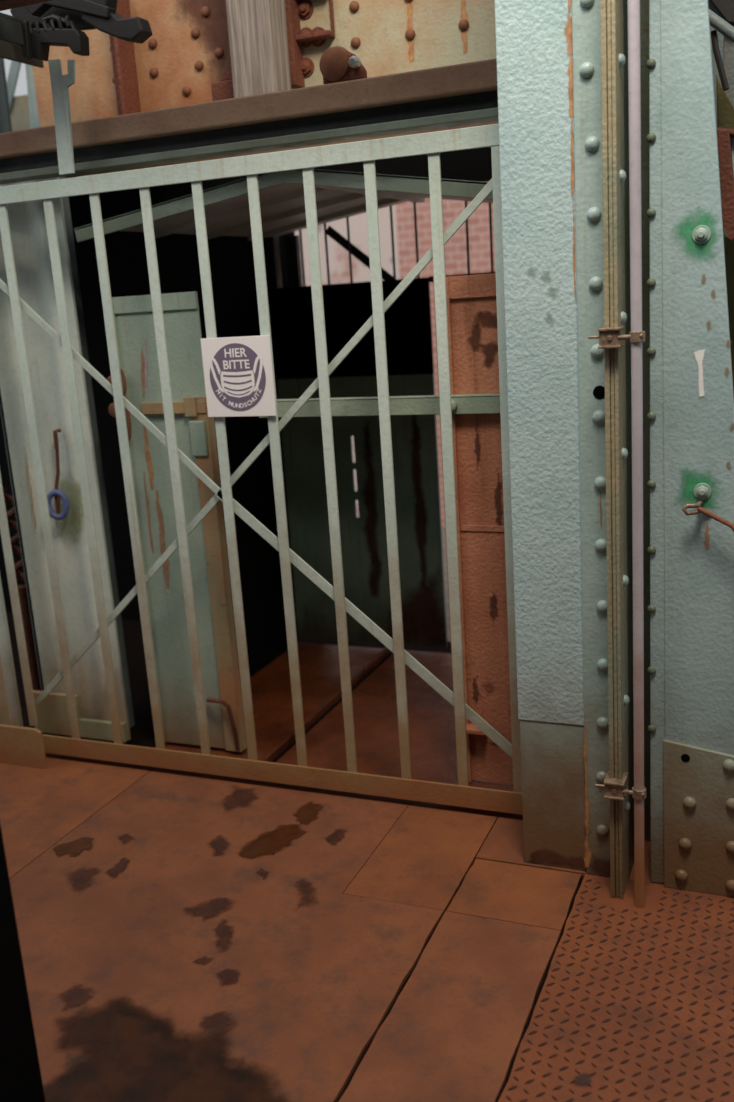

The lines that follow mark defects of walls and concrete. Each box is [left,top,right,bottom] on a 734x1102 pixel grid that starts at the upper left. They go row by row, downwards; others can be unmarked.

corrosion [181,0,230,78]
corrosion [565,0,574,195]
corrosion [469,312,498,367]
corrosion [143,414,169,588]
corrosion [402,415,443,641]
corrosion [495,477,503,526]
damp [223,788,257,809]
damp [54,837,93,857]
damp [69,858,129,889]
damp [240,802,322,878]
damp [185,898,232,951]
damp [218,969,239,985]